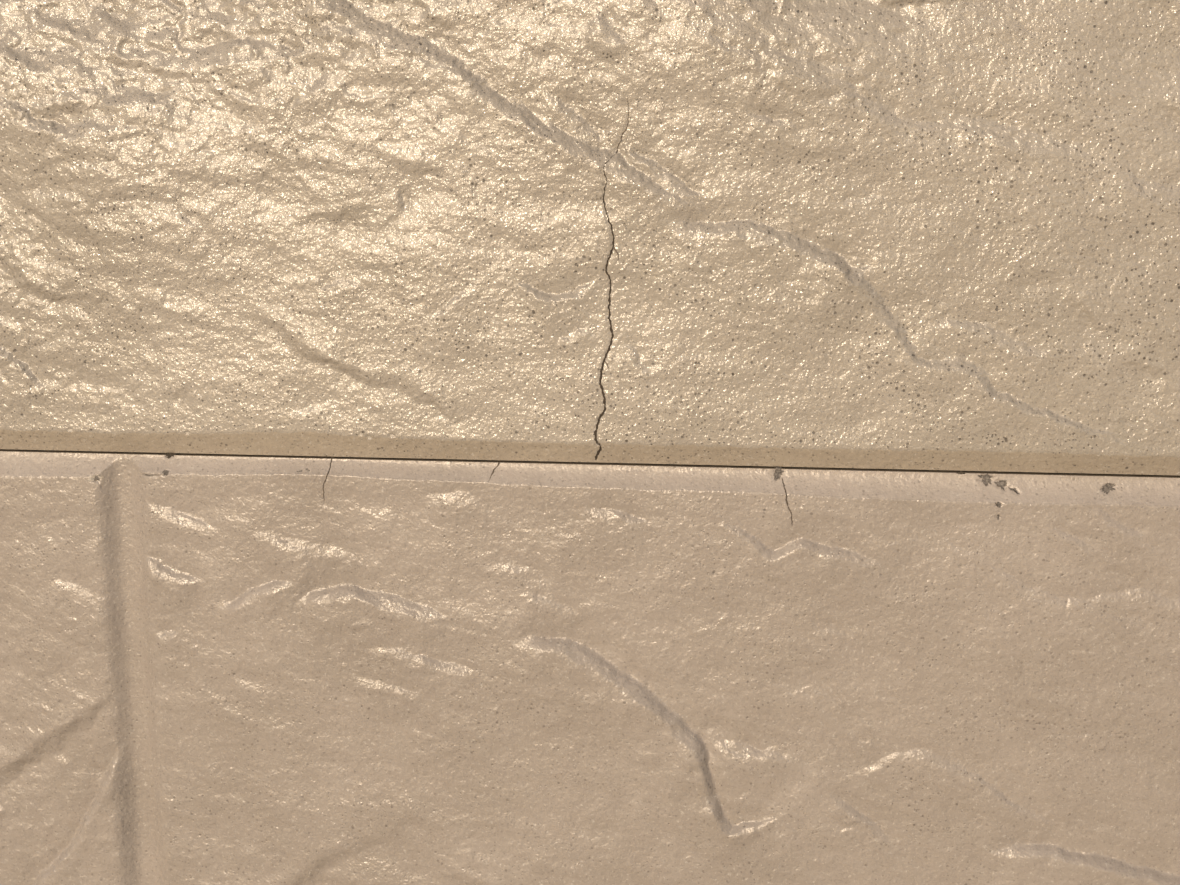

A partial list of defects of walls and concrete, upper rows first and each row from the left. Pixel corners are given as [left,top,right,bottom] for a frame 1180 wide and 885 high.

crack [593,101,629,460]
crack [782,478,793,524]